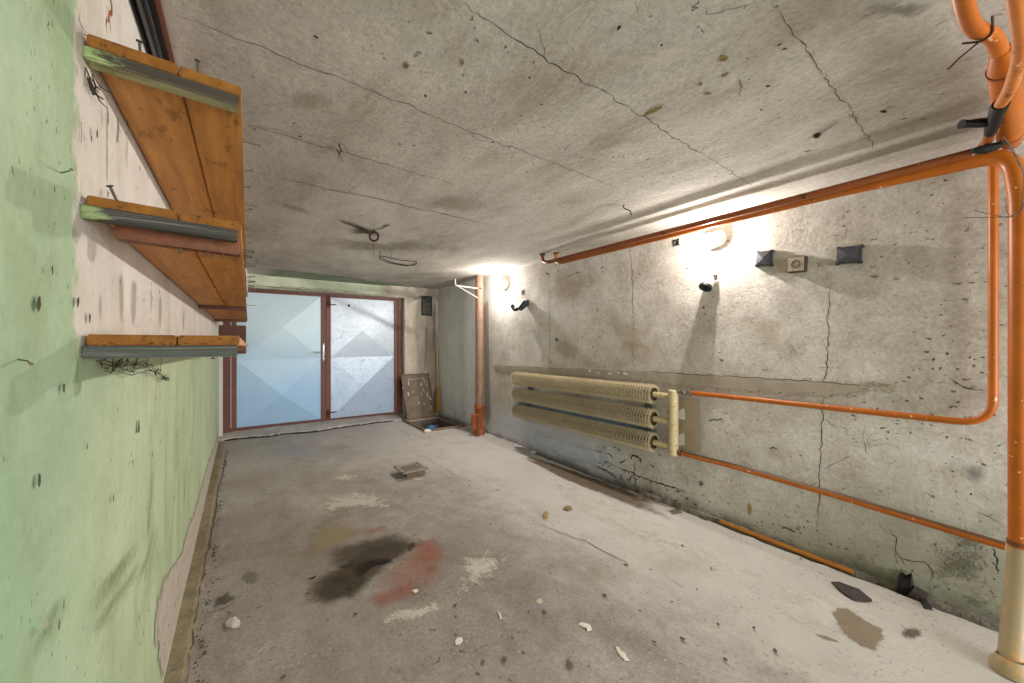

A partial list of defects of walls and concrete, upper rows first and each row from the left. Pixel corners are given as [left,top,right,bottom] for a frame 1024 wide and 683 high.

crack [178,16,619,189]
crack [463,2,752,186]
crack [705,1,877,151]
crack [788,276,879,527]
peeling [139,436,219,673]
crack [890,532,933,577]